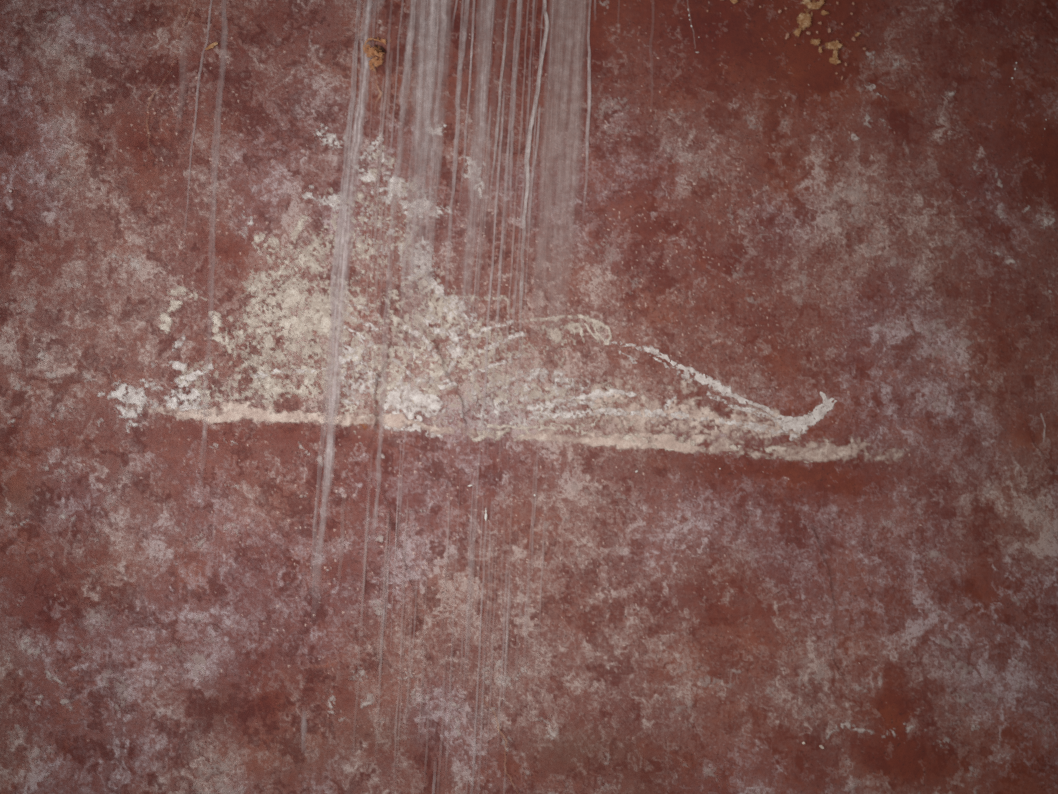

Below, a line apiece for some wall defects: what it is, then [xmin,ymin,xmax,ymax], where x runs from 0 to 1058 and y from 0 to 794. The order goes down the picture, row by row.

leakage [400,0,447,172]
leakage [454,0,516,233]
leakage [512,0,623,263]
peeling [785,0,866,80]
leakage [299,0,371,500]